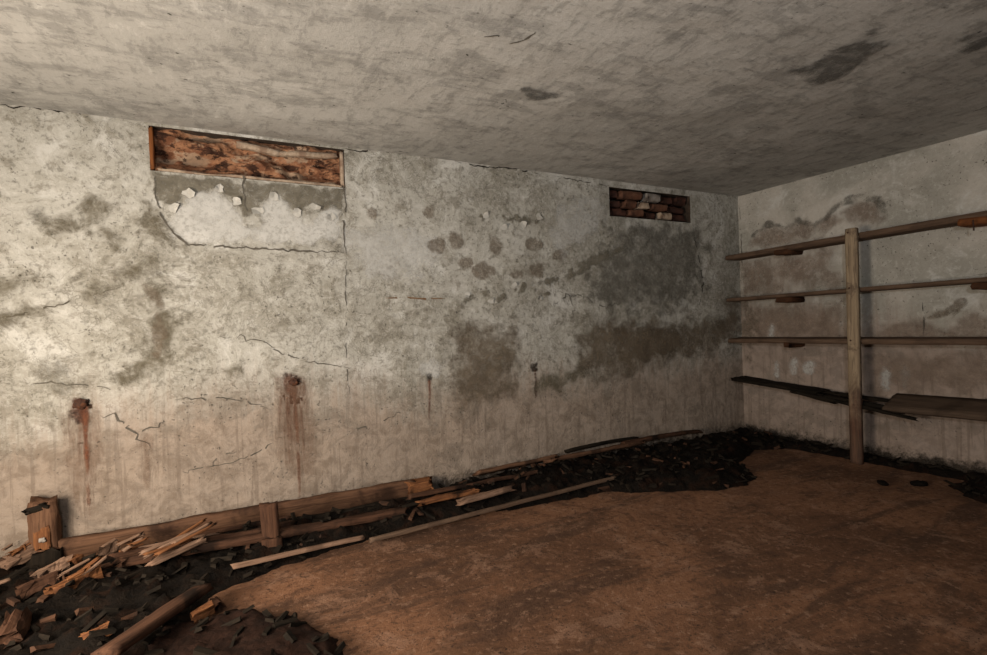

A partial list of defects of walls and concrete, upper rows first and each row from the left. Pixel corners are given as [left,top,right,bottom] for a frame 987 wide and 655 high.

flaking render [153,173,345,221]
water stain [585,224,703,308]
rust [70,399,89,469]
rust [283,373,304,442]
water stain [451,323,517,409]
water stain [536,296,840,391]